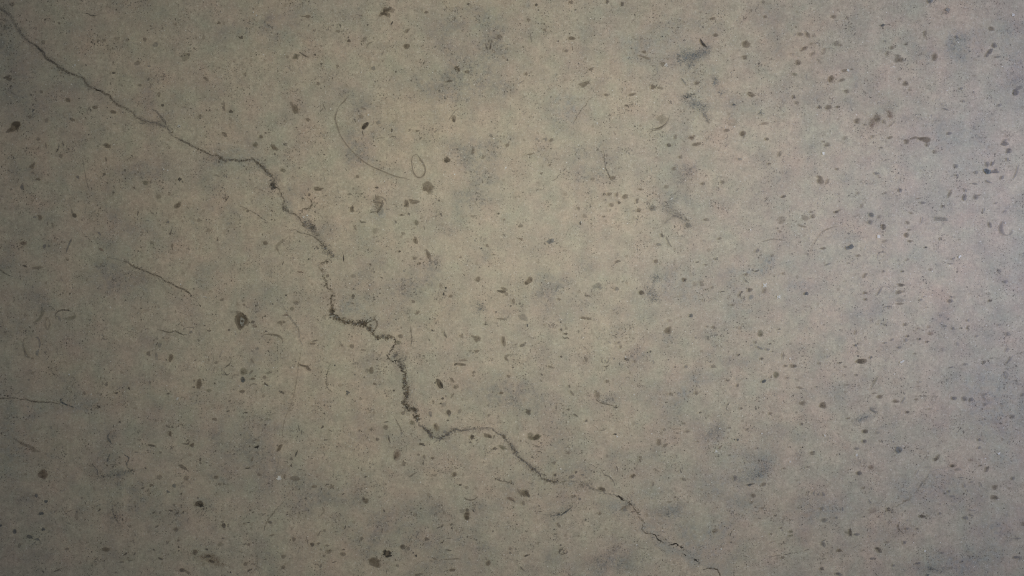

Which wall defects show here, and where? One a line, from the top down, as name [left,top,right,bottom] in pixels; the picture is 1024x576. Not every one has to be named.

crack [324,285,447,439]
crack [641,527,720,575]